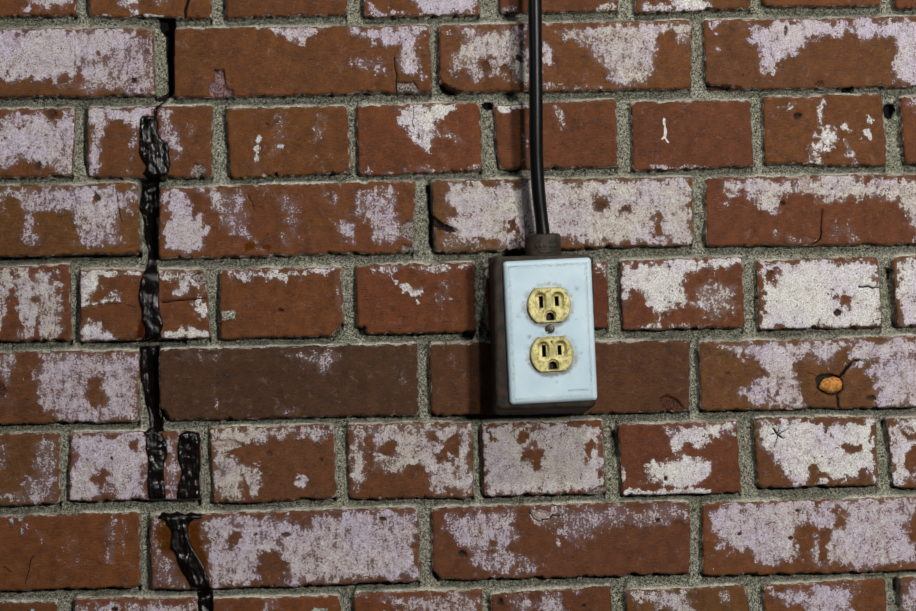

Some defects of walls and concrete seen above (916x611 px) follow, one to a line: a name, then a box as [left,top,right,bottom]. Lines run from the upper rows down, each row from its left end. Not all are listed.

crack [154,0,190,128]
spalling [208,68,234,100]
damp [545,164,706,247]
damp [0,107,341,505]
crack [162,296,207,304]
damp [757,259,881,329]
damp [348,422,604,498]
damp [540,421,736,547]
damp [717,337,916,487]
crack [808,359,862,408]
damp [74,509,419,611]
damp [707,497,916,611]